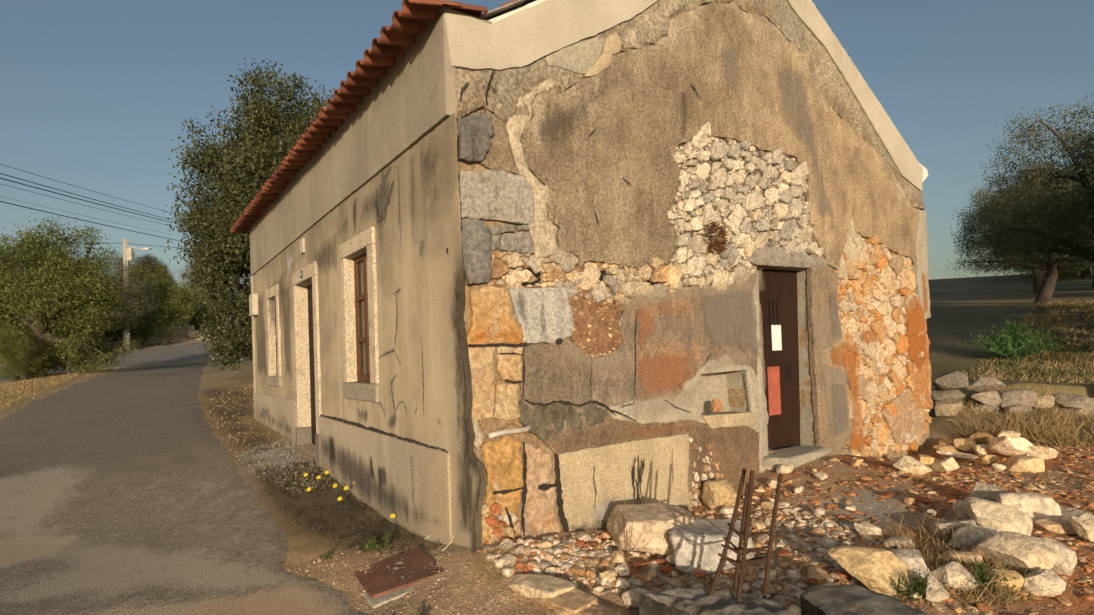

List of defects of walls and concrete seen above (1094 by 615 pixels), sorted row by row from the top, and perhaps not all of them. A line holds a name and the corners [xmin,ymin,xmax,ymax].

flaking render [486,121,826,359]
crack [320,289,448,453]
crack [468,309,638,421]
flaking render [822,216,932,458]
damp [322,439,407,512]
flaking render [471,419,487,451]
flaking render [481,502,526,546]
flaking render [500,418,528,439]